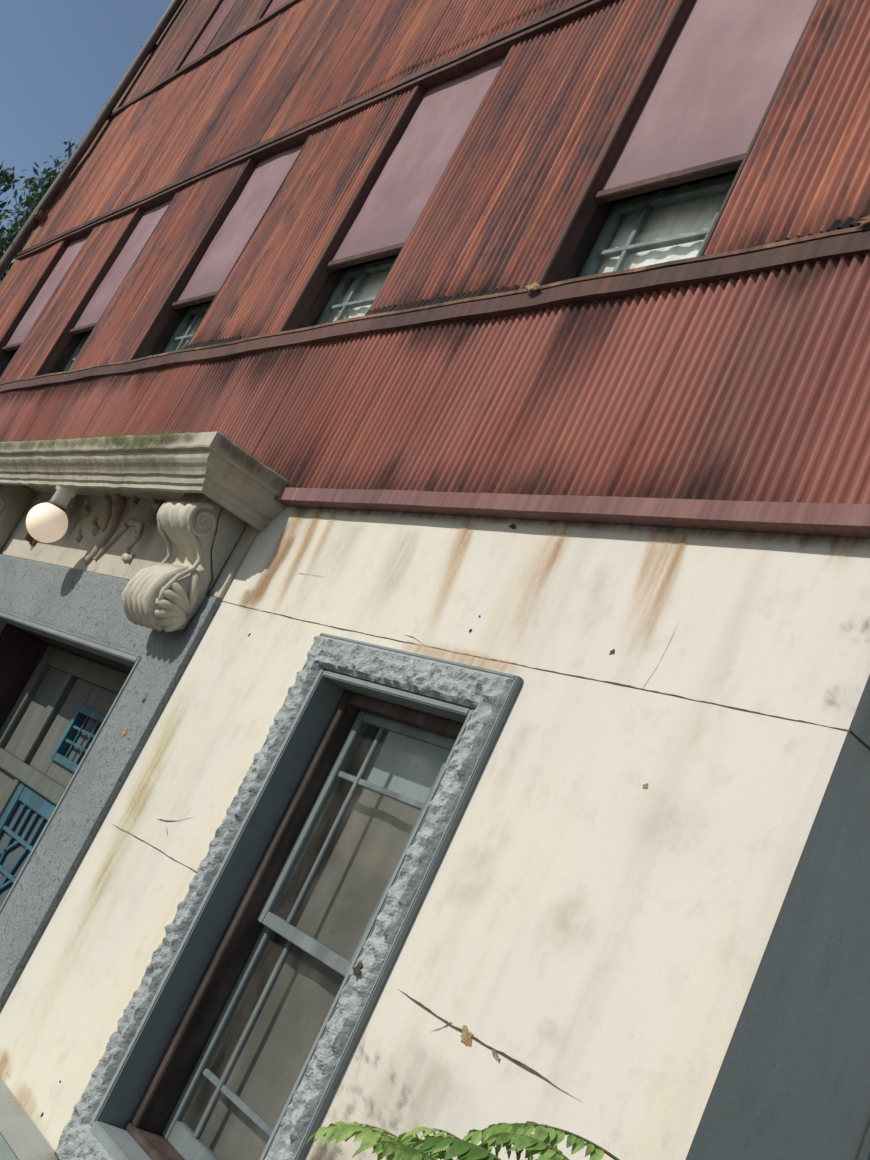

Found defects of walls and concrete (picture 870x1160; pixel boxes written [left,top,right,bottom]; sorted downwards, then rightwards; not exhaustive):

corrosion [243,509,319,603]
crack [112,818,197,873]
crack [401,991,582,1102]